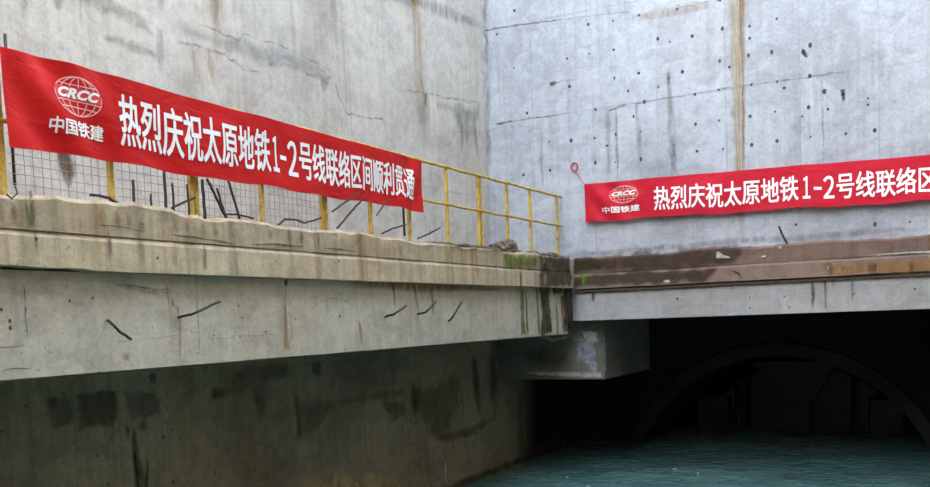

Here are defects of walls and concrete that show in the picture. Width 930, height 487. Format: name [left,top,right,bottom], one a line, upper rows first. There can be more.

corrosion [731,0,744,171]
water stain [126,427,148,487]
water stain [444,379,587,487]